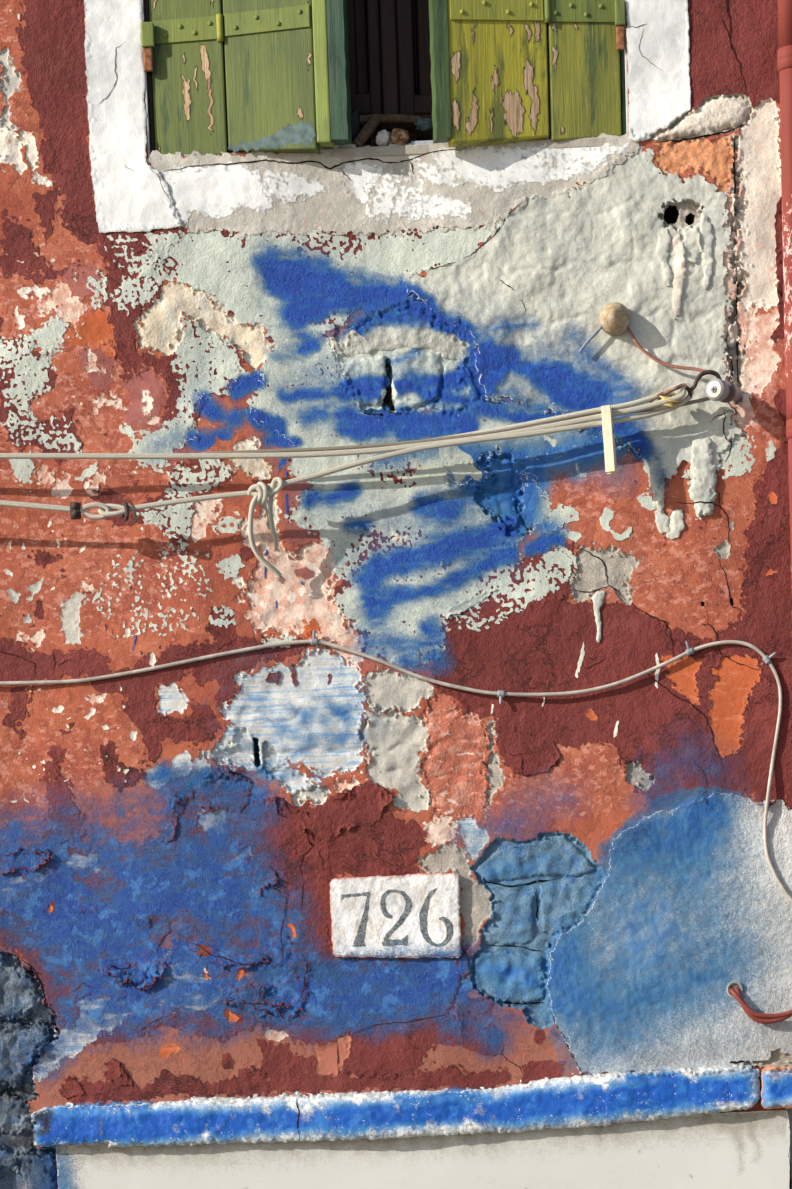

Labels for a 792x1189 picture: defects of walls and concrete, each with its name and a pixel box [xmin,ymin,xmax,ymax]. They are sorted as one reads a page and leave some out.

crack [722,0,746,91]
crack [125,148,468,202]
crack [655,125,742,216]
peeling [0,0,632,504]
peeling [650,0,784,480]
crack [731,267,739,383]
peeling [774,388,786,427]
peeling [0,428,792,1189]